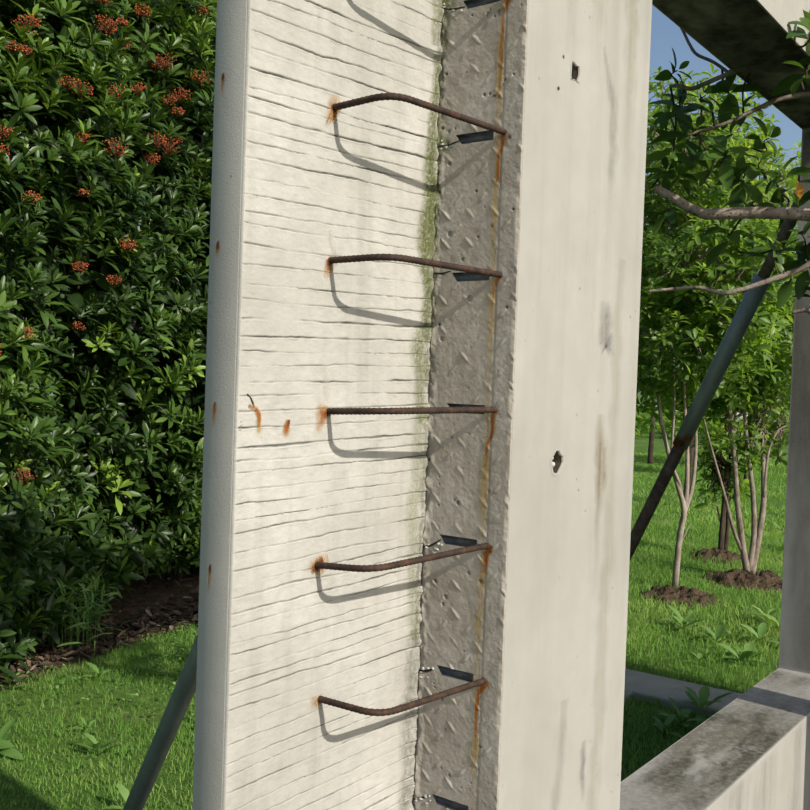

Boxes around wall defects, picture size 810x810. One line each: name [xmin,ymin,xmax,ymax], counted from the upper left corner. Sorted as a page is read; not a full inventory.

crack [441,6,465,43]
corrosion [497,0,511,97]
crack [435,140,462,234]
corrosion [493,133,509,218]
crack [428,267,451,393]
corrosion [485,410,498,472]
corrosion [483,545,492,575]
corrosion [474,677,489,755]
damp [646,704,796,807]